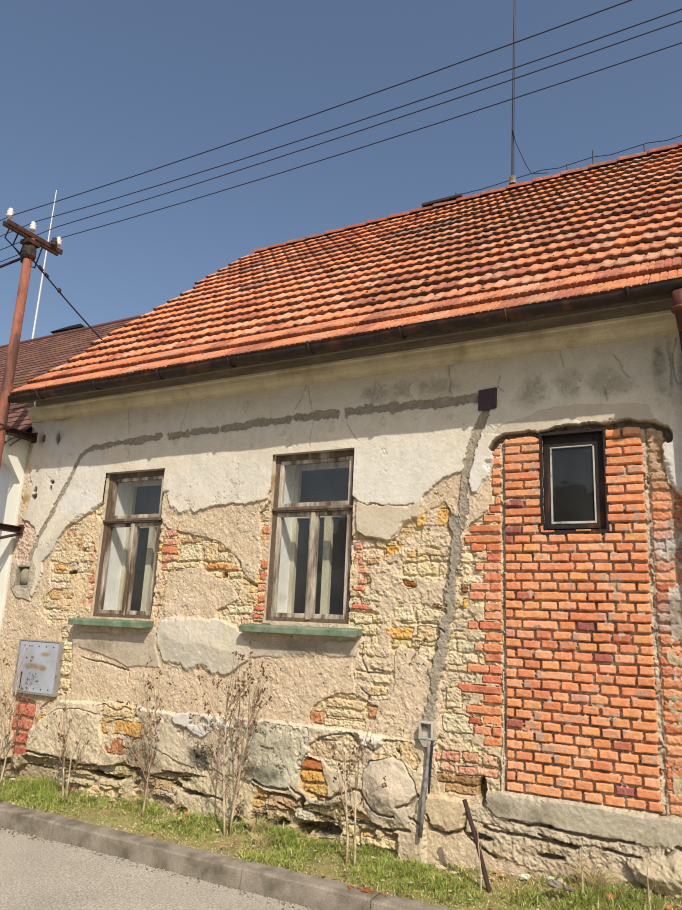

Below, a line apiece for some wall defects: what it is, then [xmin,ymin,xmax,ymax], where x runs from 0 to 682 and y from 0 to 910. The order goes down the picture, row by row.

hole [22,479,55,500]
flaking render [0,502,110,793]
flaking render [101,402,682,836]
peeling [358,826,398,857]
spalling [466,820,653,892]